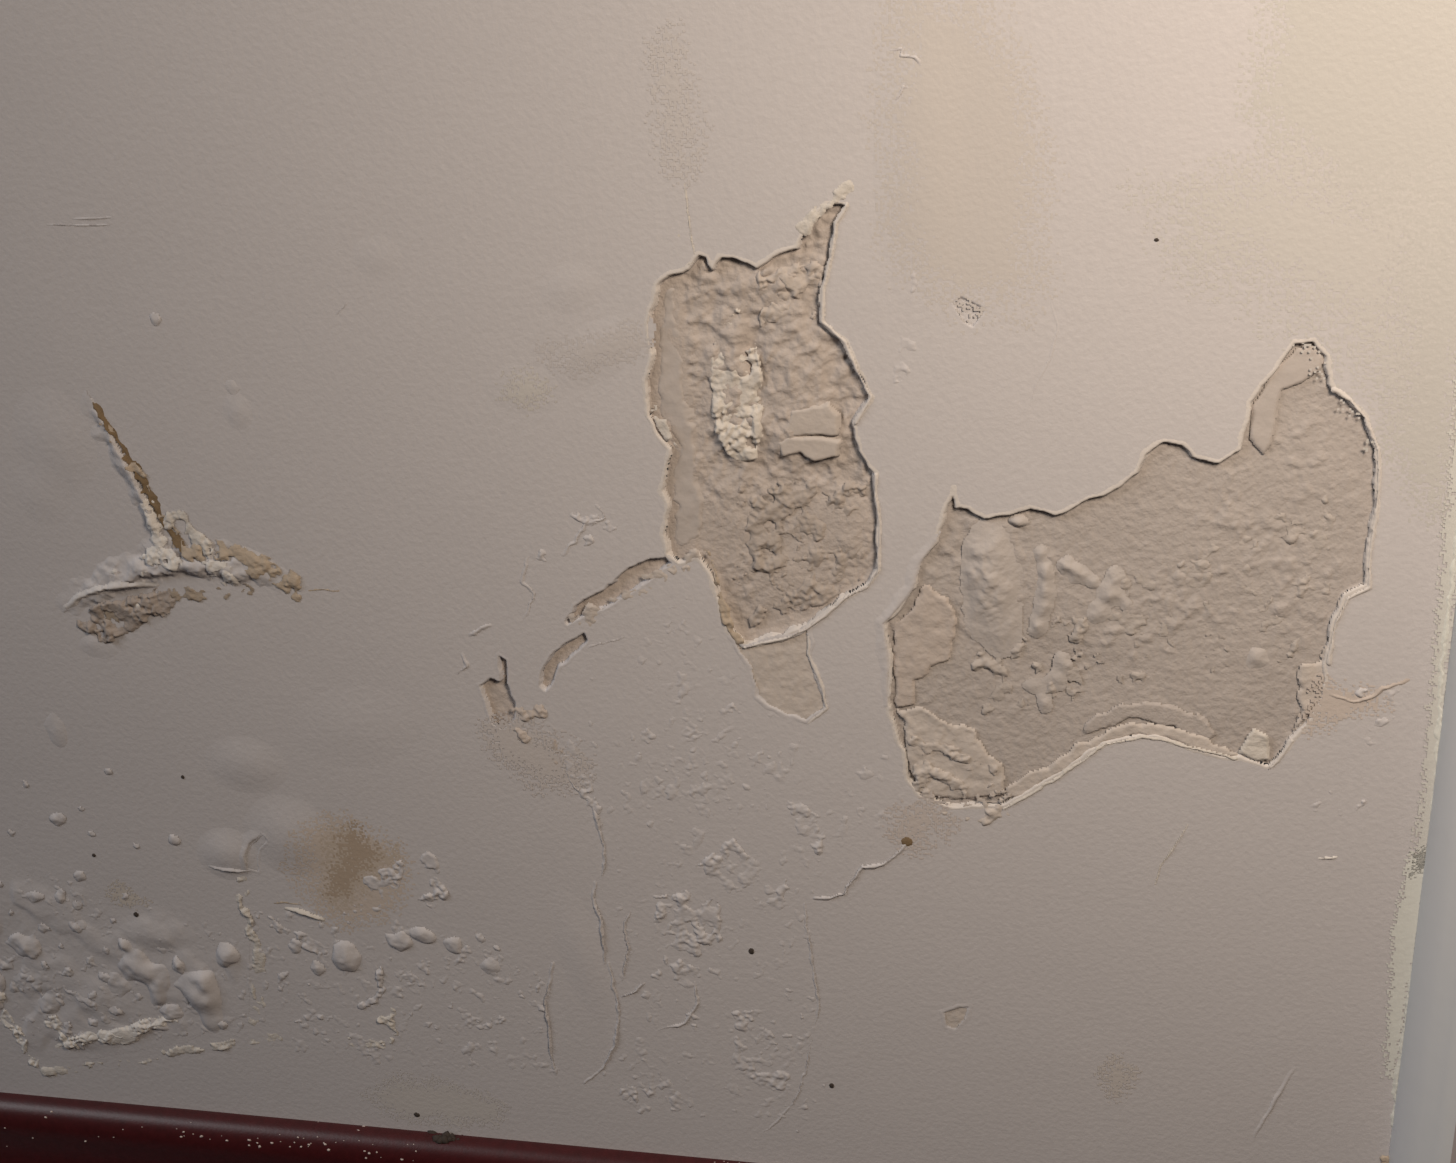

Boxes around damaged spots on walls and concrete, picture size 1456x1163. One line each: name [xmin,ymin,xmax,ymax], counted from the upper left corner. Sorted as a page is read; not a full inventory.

peeling [475,652,519,730]
spalling [536,201,882,724]
peeling [948,292,990,333]
spalling [874,338,1382,810]